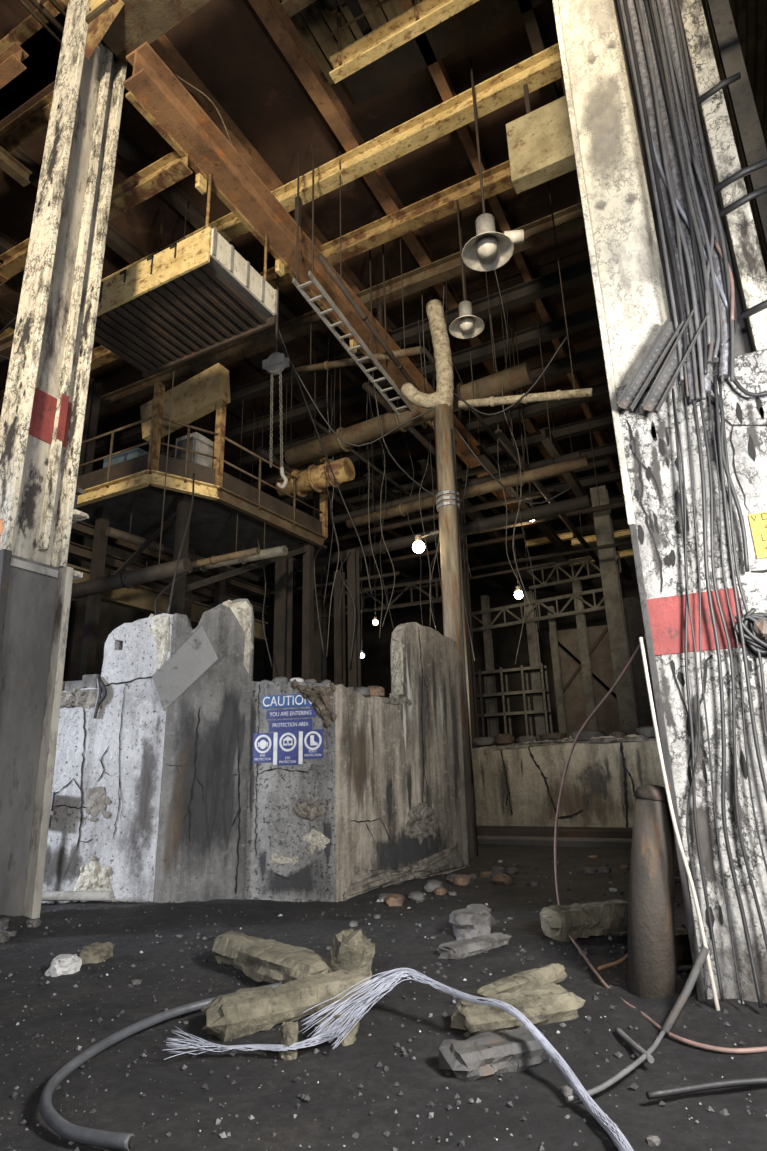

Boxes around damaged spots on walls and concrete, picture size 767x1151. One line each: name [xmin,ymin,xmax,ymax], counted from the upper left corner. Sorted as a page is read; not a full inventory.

crack [53,676,152,879]
damp [206,691,245,847]
damp [348,722,374,804]
crack [500,747,583,819]
spalling [268,797,330,865]
spalling [67,855,118,902]